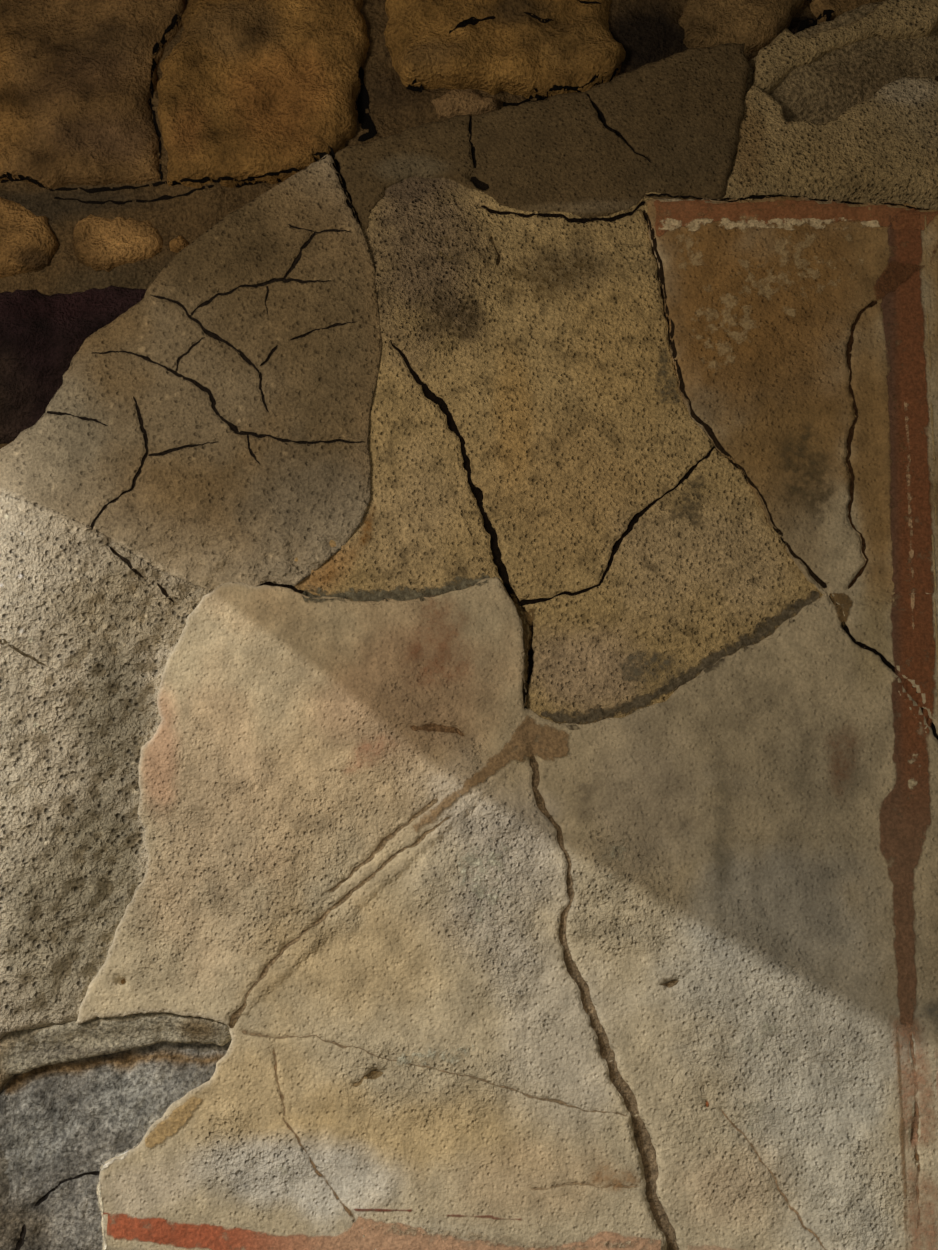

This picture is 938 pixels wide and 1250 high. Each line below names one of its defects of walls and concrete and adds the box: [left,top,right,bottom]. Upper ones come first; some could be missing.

crack [407,79,424,93]
crack [468,116,476,168]
crack [503,64,651,162]
crack [0,14,364,603]
spalling [0,42,938,730]
crack [391,193,938,740]
crack [229,754,679,1250]
spalling [0,1012,232,1250]
crack [721,1110,826,1250]